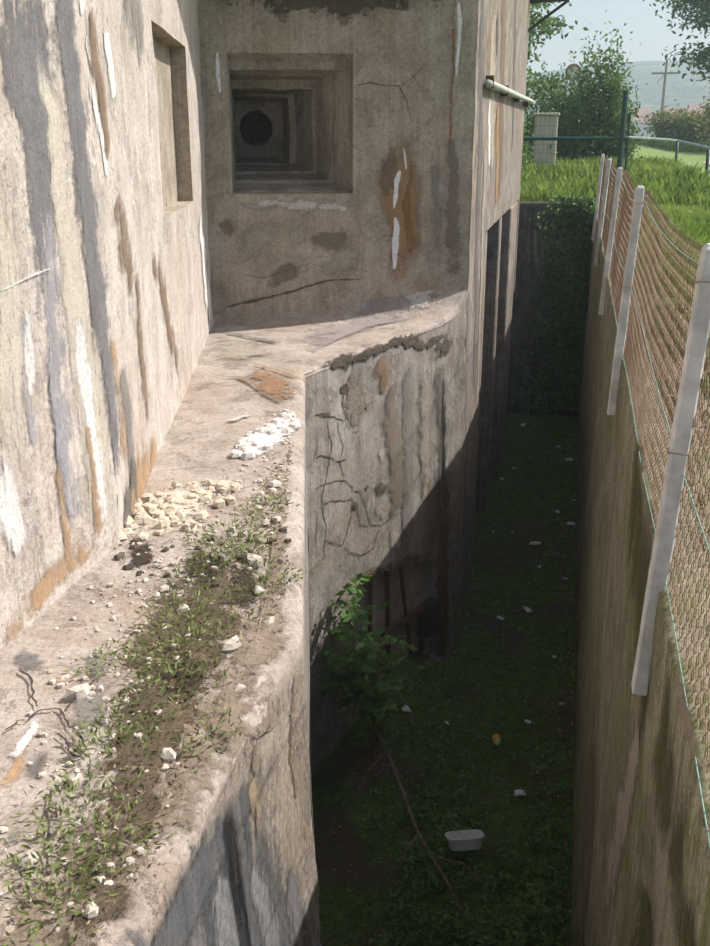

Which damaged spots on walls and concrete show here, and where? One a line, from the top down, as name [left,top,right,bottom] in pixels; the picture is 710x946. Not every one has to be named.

damp [224,0,409,24]
damp [0,0,157,527]
damp [153,258,179,374]
corrosion [380,145,419,284]
spalling [324,332,453,434]
corrosion [8,466,91,641]
corrosion [86,427,102,531]
crack [314,377,389,556]
spalling [366,482,394,519]
crack [4,668,87,758]
crack [44,788,52,875]
damp [120,769,322,946]